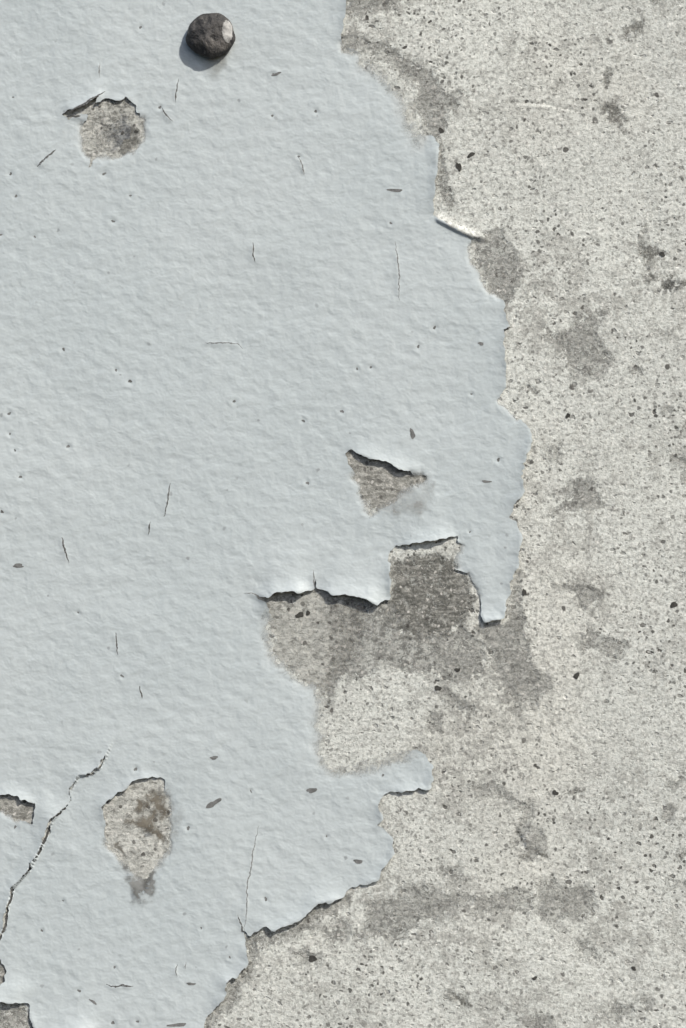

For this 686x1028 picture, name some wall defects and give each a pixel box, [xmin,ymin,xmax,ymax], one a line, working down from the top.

peeling [222,20,234,43]
peeling [63,85,146,165]
spalling [337,0,465,211]
spalling [601,97,627,130]
spalling [471,226,522,309]
spalling [638,226,662,282]
peeling [345,438,428,511]
peeling [257,521,553,716]
crack [0,745,112,985]
peeling [94,767,172,880]
peeling [204,865,594,1028]
peeling [0,977,115,1028]